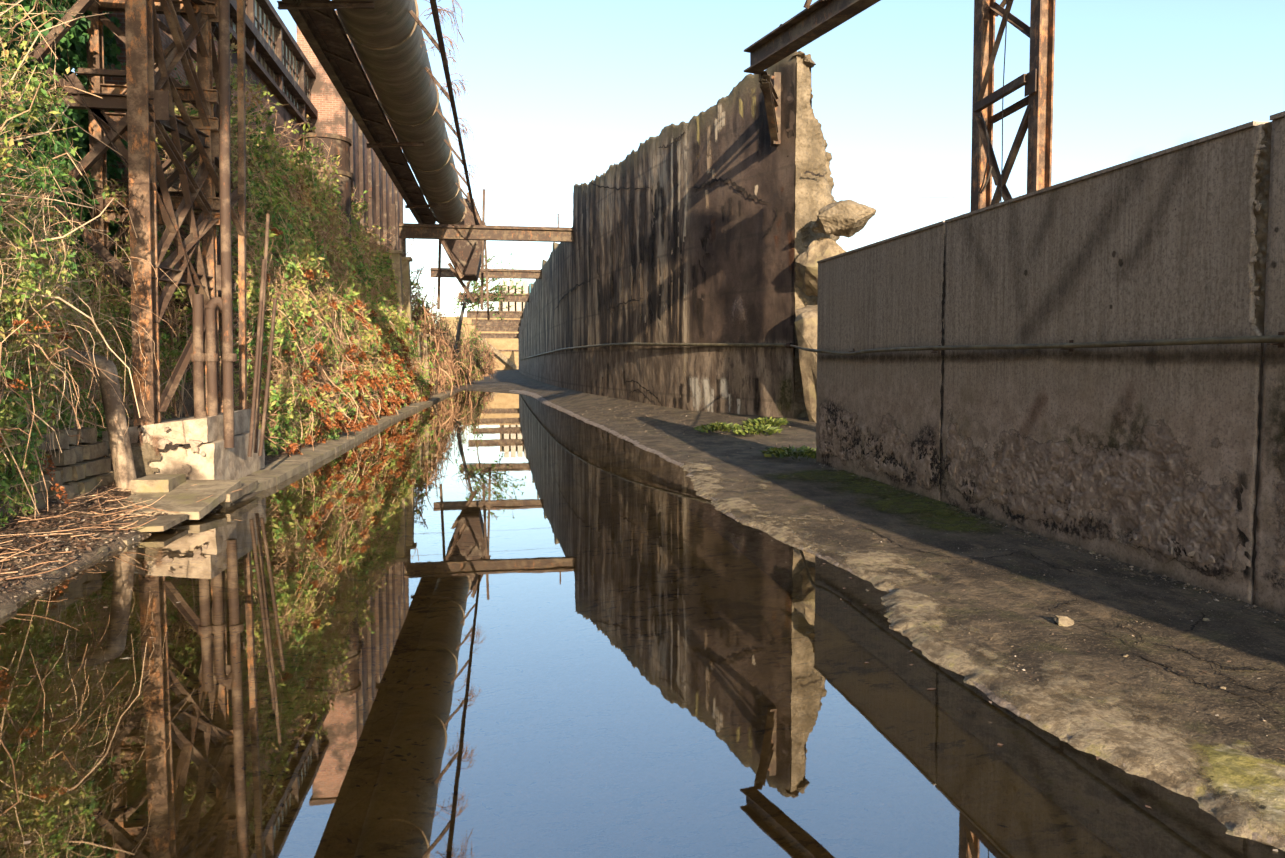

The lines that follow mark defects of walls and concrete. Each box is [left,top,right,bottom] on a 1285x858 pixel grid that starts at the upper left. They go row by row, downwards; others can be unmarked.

leakage [576,64,795,410]
leakage [822,402,1137,541]
leakage [681,463,1285,858]
crack [834,522,1284,715]